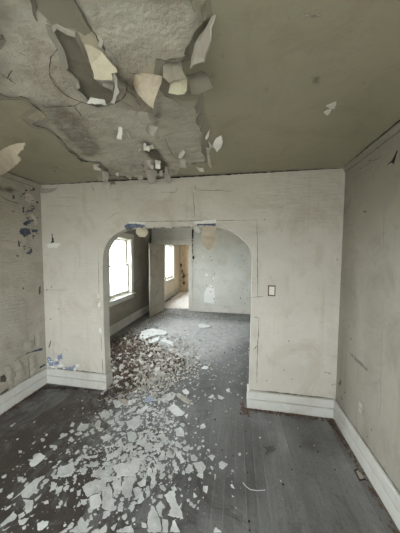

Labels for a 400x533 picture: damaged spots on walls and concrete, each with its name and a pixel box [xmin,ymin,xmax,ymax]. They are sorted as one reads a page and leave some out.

peeling [0,0,223,185]
peeling [12,188,39,255]
peeling [124,219,216,260]
peeling [204,260,220,304]
peeling [40,353,84,372]